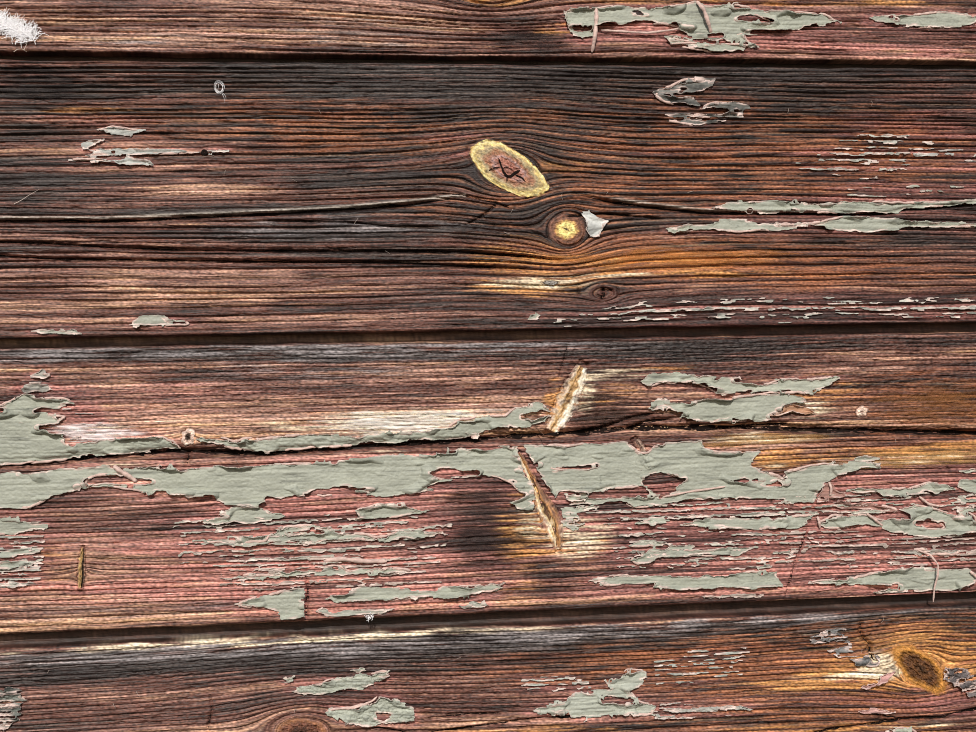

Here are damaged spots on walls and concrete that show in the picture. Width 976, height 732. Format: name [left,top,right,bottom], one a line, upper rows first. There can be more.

peeling [563,1,842,53]
peeling [870,11,976,29]
peeling [652,76,751,126]
peeling [68,125,229,166]
peeling [666,134,976,234]
peeling [0,369,976,620]
peeling [809,628,880,667]
peeling [283,667,390,696]
peeling [521,647,753,722]
peeling [325,696,415,727]